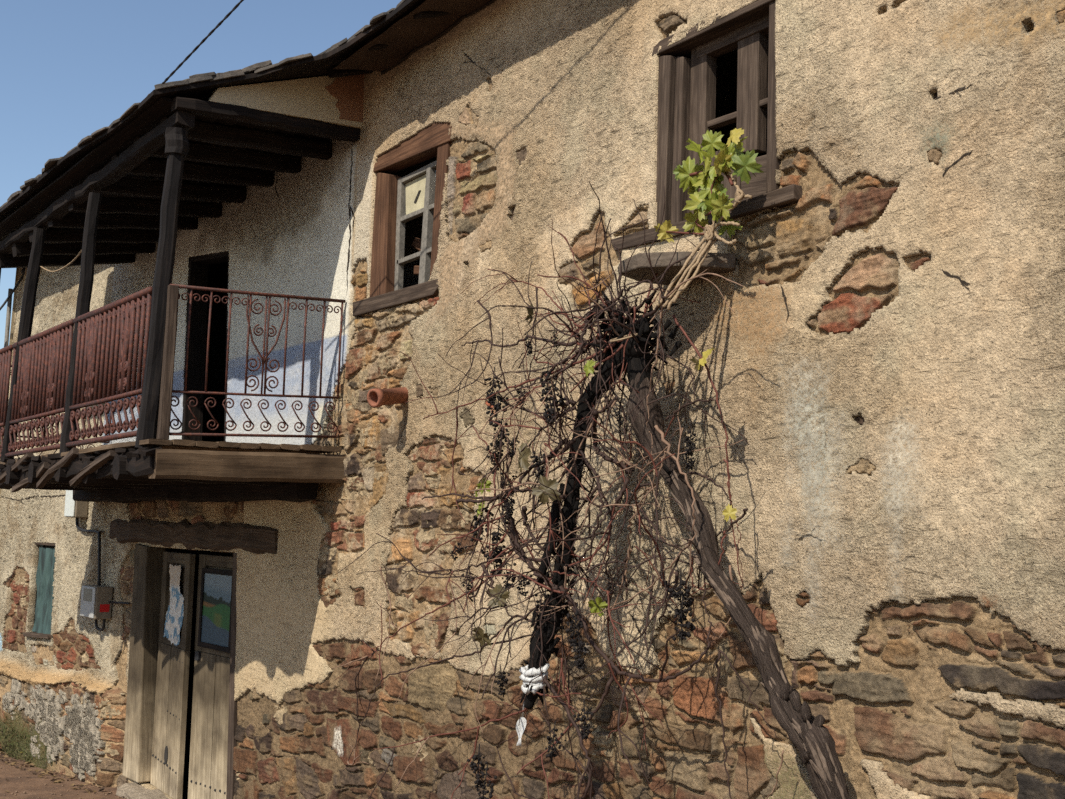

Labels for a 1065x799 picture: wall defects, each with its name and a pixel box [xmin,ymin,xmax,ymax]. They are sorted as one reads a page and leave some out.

crack [346,156,354,295]
flaking render [351,260,368,302]
flaking render [447,139,498,242]
flaking render [558,205,649,309]
flaking render [731,150,899,289]
flaking render [807,247,931,336]
flaking render [311,295,439,607]
flaking render [459,409,475,427]
peeling [0,542,138,787]
flaking render [233,435,806,799]
flaking render [735,580,1065,799]